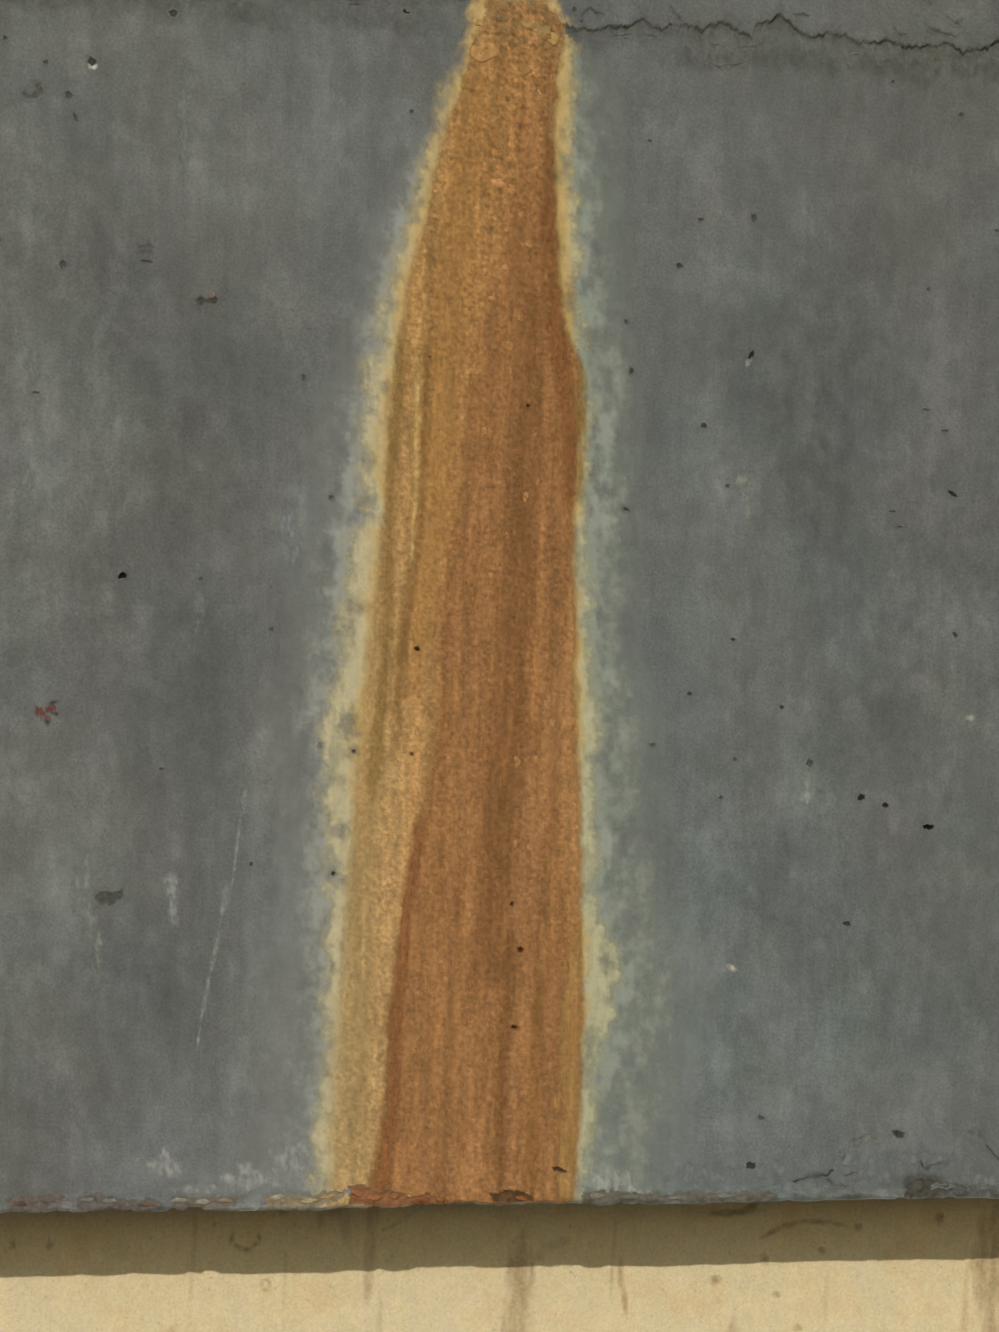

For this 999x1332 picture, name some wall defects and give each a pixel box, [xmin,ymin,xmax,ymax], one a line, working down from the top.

crack [177,0,471,22]
crack [563,0,999,77]
rust [310,0,622,1208]
spalling [0,1184,451,1213]
spalling [489,1190,538,1206]
spalling [579,1159,781,1206]
spalling [899,1174,958,1200]